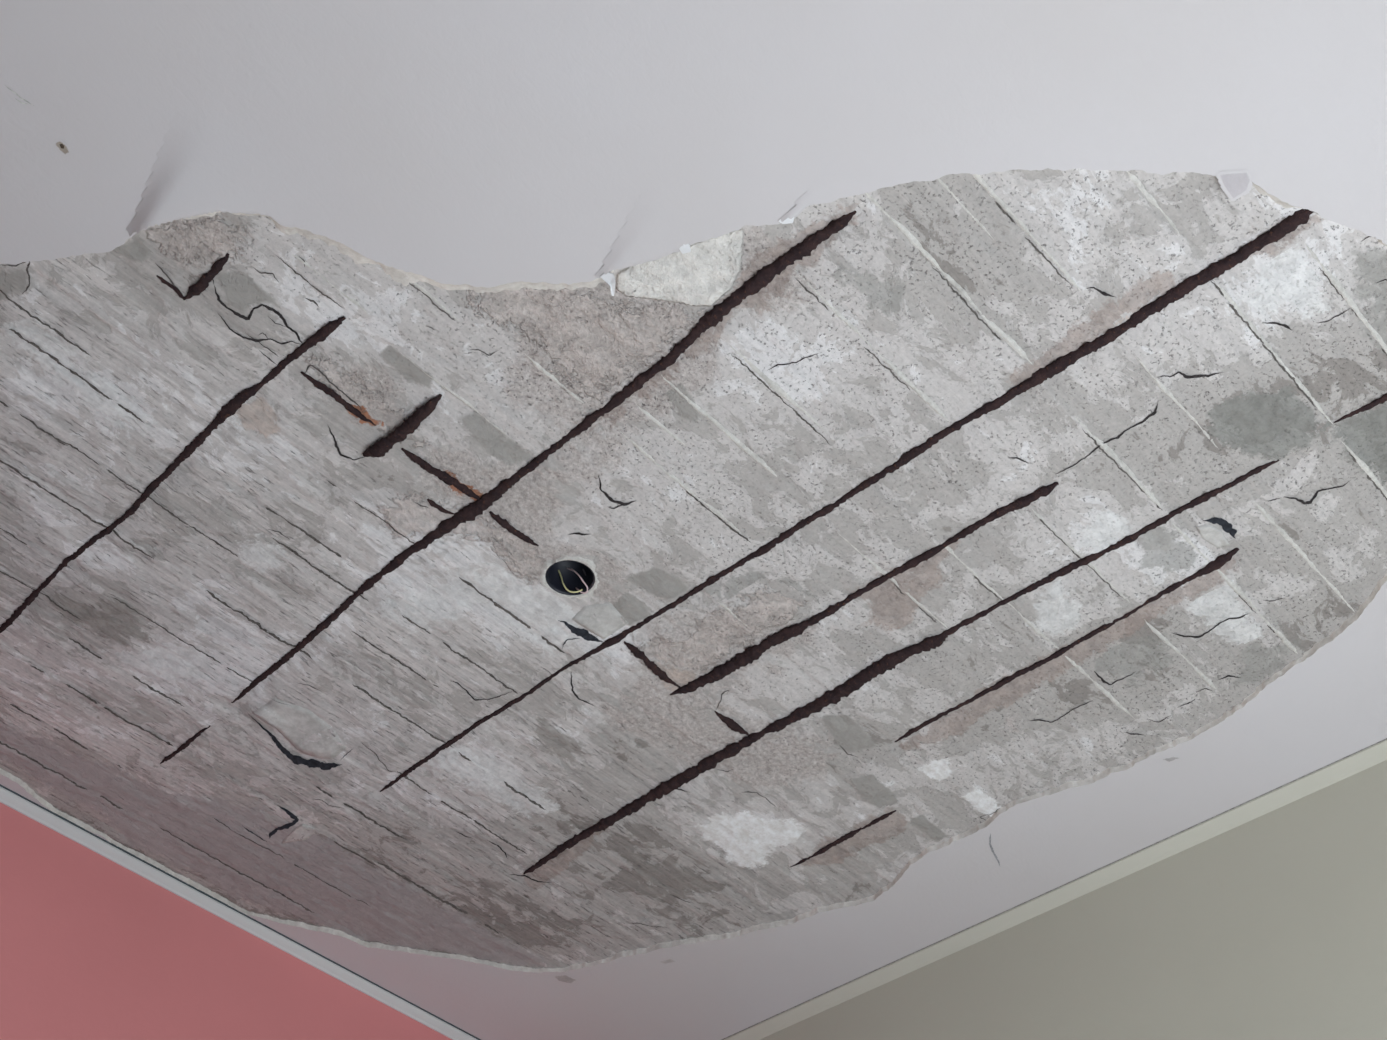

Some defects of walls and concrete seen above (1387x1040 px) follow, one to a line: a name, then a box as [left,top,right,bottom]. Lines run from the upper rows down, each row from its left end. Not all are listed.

crack [156,256,362,410]
rust [558,194,872,455]
rust [231,390,286,440]
crack [328,426,364,460]
rust [339,400,386,430]
rust [433,465,487,503]
spalling [0,168,1387,973]
rust [846,536,963,642]
rust [648,657,702,696]
rust [894,551,1245,753]
rust [519,818,615,892]
rust [795,805,912,872]